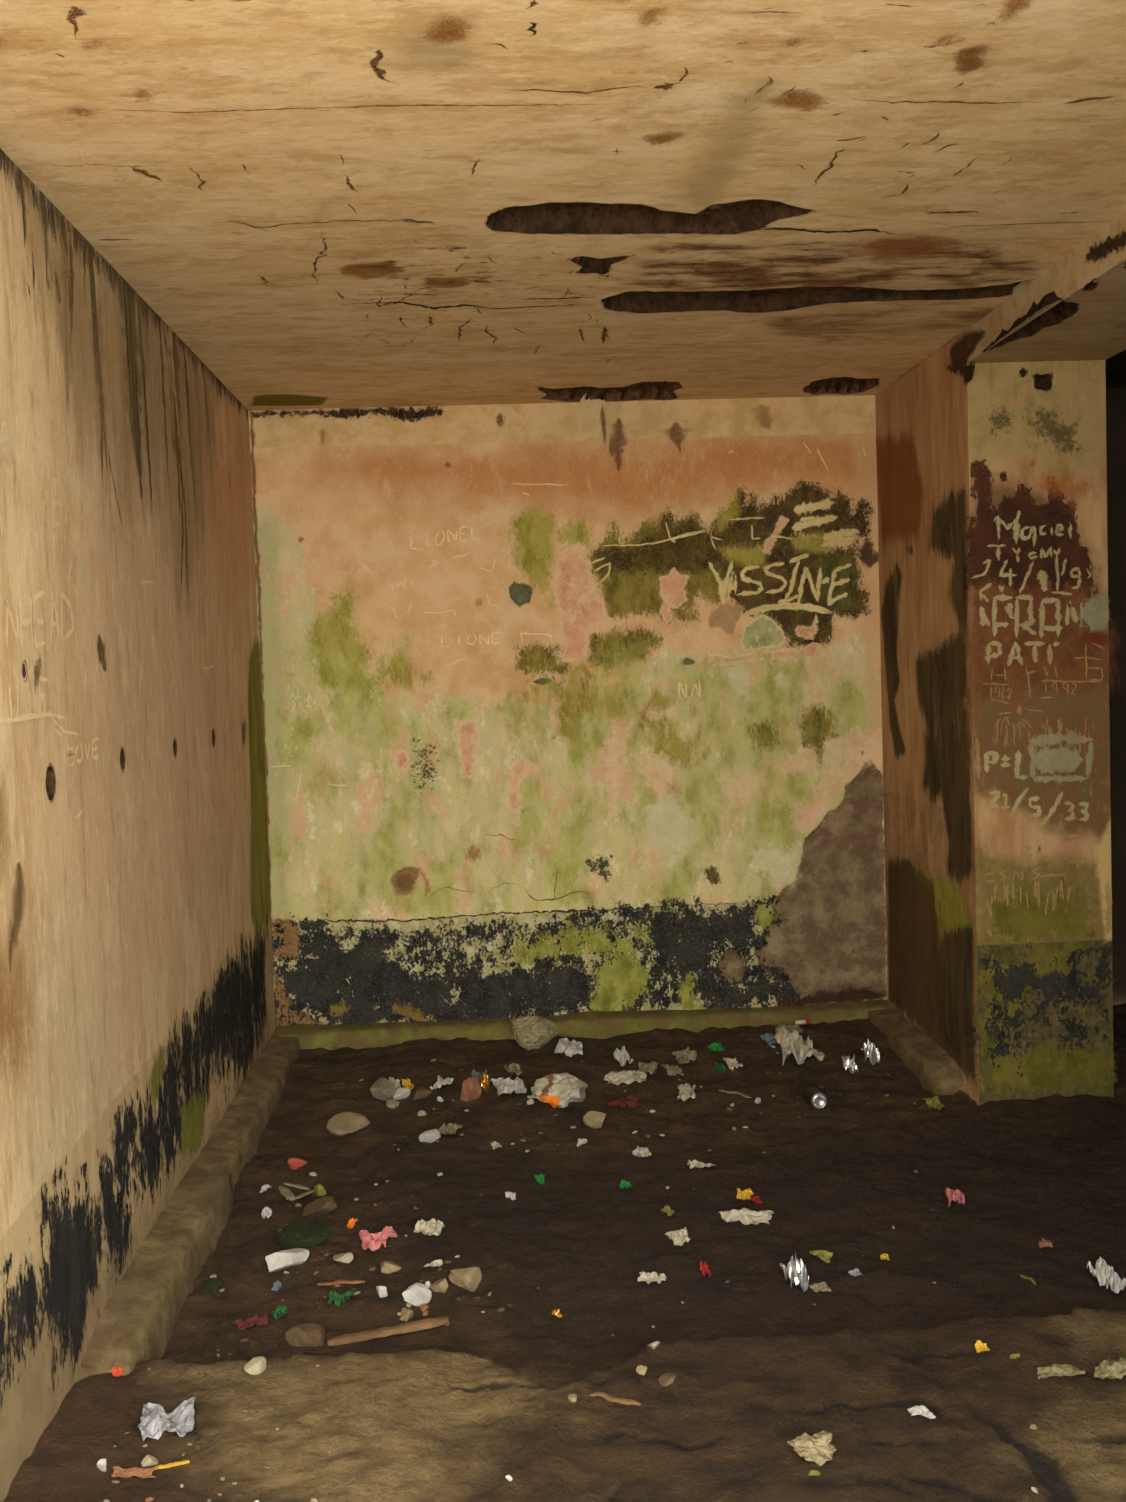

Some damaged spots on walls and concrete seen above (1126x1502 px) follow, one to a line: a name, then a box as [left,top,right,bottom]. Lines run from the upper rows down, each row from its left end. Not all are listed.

crack [56,6,87,57]
crack [98,49,689,113]
crack [755,81,1114,235]
spalling [484,199,816,235]
crack [49,156,624,363]
spalling [601,278,1035,314]
damp [0,148,444,638]
spalling [535,381,683,402]
damp [405,734,447,800]
damp [590,458,1122,1087]
damp [584,854,615,882]
peeling [0,723,887,1423]